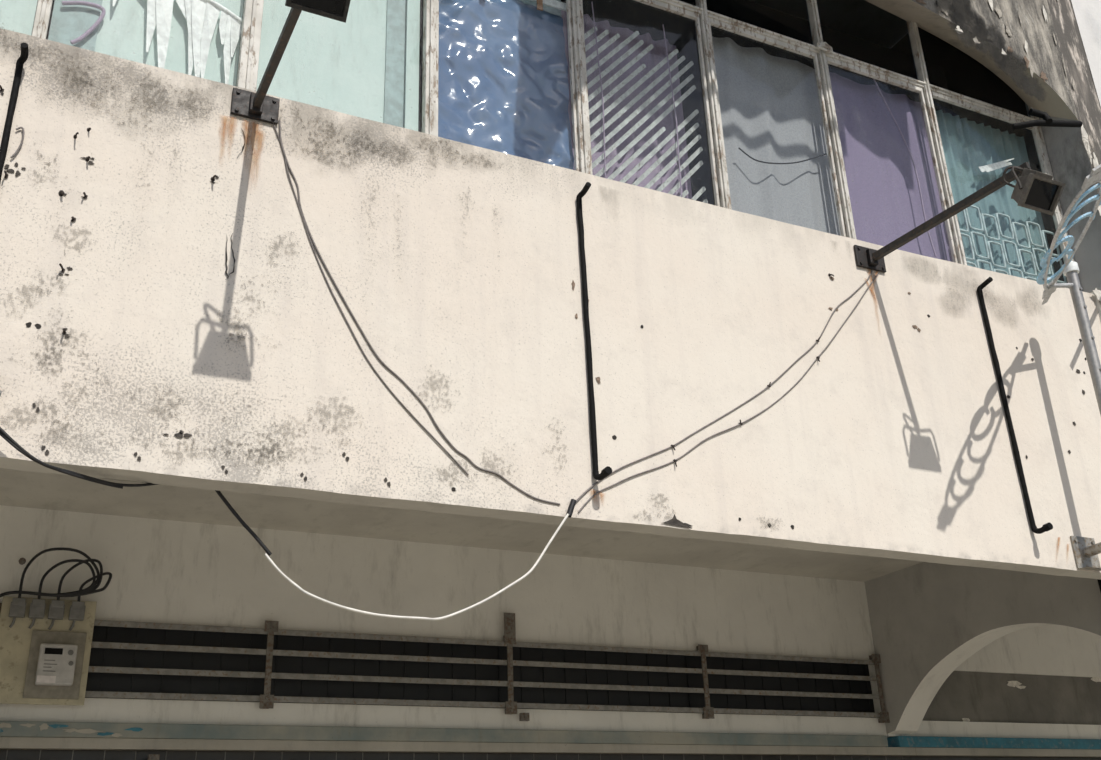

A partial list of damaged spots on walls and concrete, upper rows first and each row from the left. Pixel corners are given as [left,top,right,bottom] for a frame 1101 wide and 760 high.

mould [936,0,1045,101]
rust [223,116,263,150]